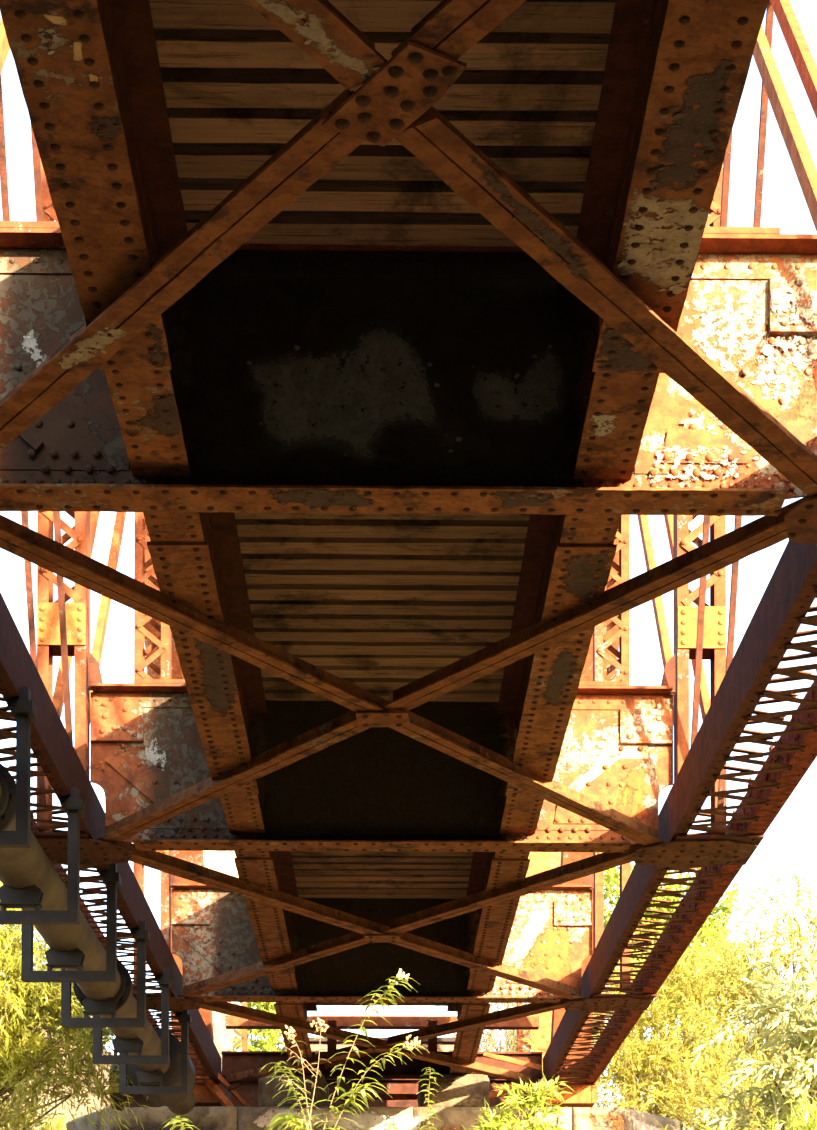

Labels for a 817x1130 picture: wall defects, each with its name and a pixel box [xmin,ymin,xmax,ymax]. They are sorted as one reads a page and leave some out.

peeling [255,0,381,81]
rust [649,59,732,191]
peeling [16,324,128,369]
peeling [691,286,817,400]
peeling [667,378,723,429]
peeling [644,432,781,484]
peeling [145,737,167,771]
peeling [566,726,649,792]
peeling [511,910,550,964]